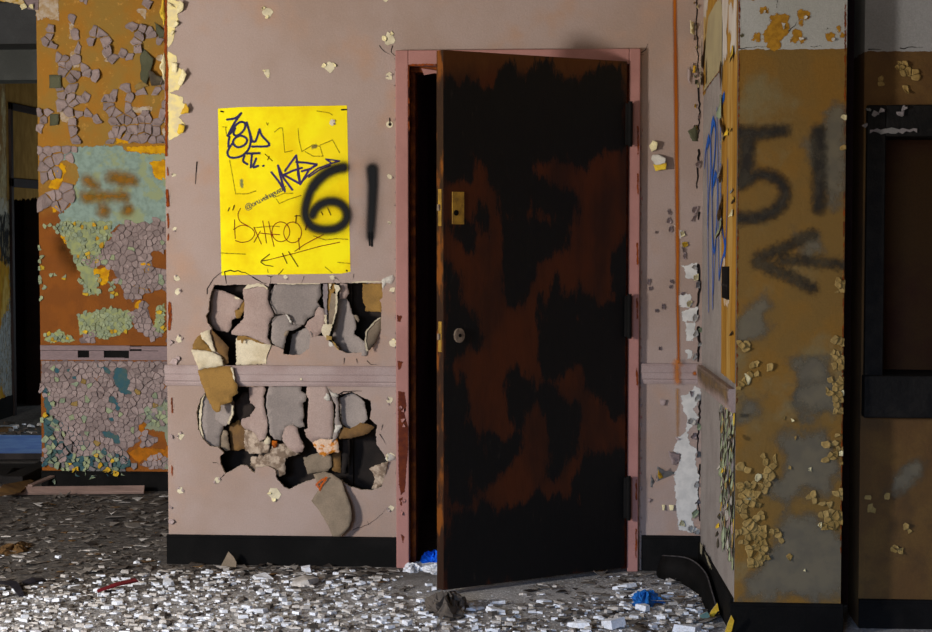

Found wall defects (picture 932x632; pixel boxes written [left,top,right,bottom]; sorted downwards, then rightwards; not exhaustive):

crack [694,0,702,188]
peeling [751,0,810,52]
peeling [825,25,845,42]
peeling [0,0,190,345]
peeling [640,129,667,230]
peeling [687,0,773,390]
peeling [667,209,702,361]
peeling [835,277,846,293]
peeling [38,356,184,485]
peeling [267,488,281,502]
peeling [638,242,712,569]
peeling [715,335,844,603]